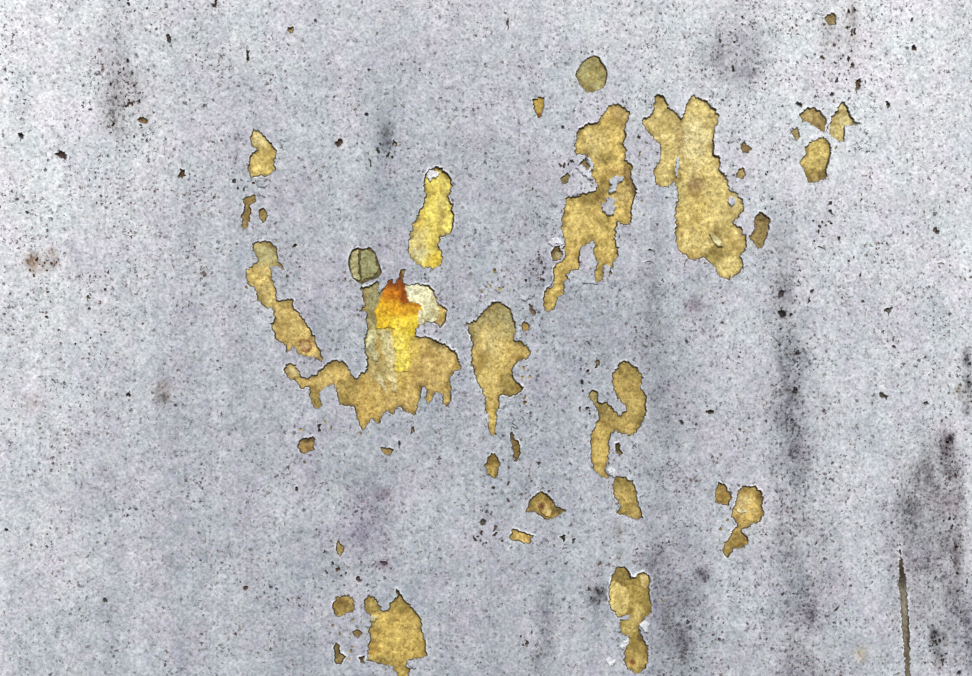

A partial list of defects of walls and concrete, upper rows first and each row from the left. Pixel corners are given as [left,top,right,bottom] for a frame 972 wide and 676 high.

peeling [232,128,278,230]
peeling [573,54,609,93]
peeling [788,50,863,185]
peeling [245,93,773,490]
peeling [323,540,429,676]
peeling [524,489,567,521]
peeling [578,359,649,522]
peeling [588,565,663,675]
peeling [713,480,766,560]
crack [897,542,912,676]
leakage [879,419,972,676]